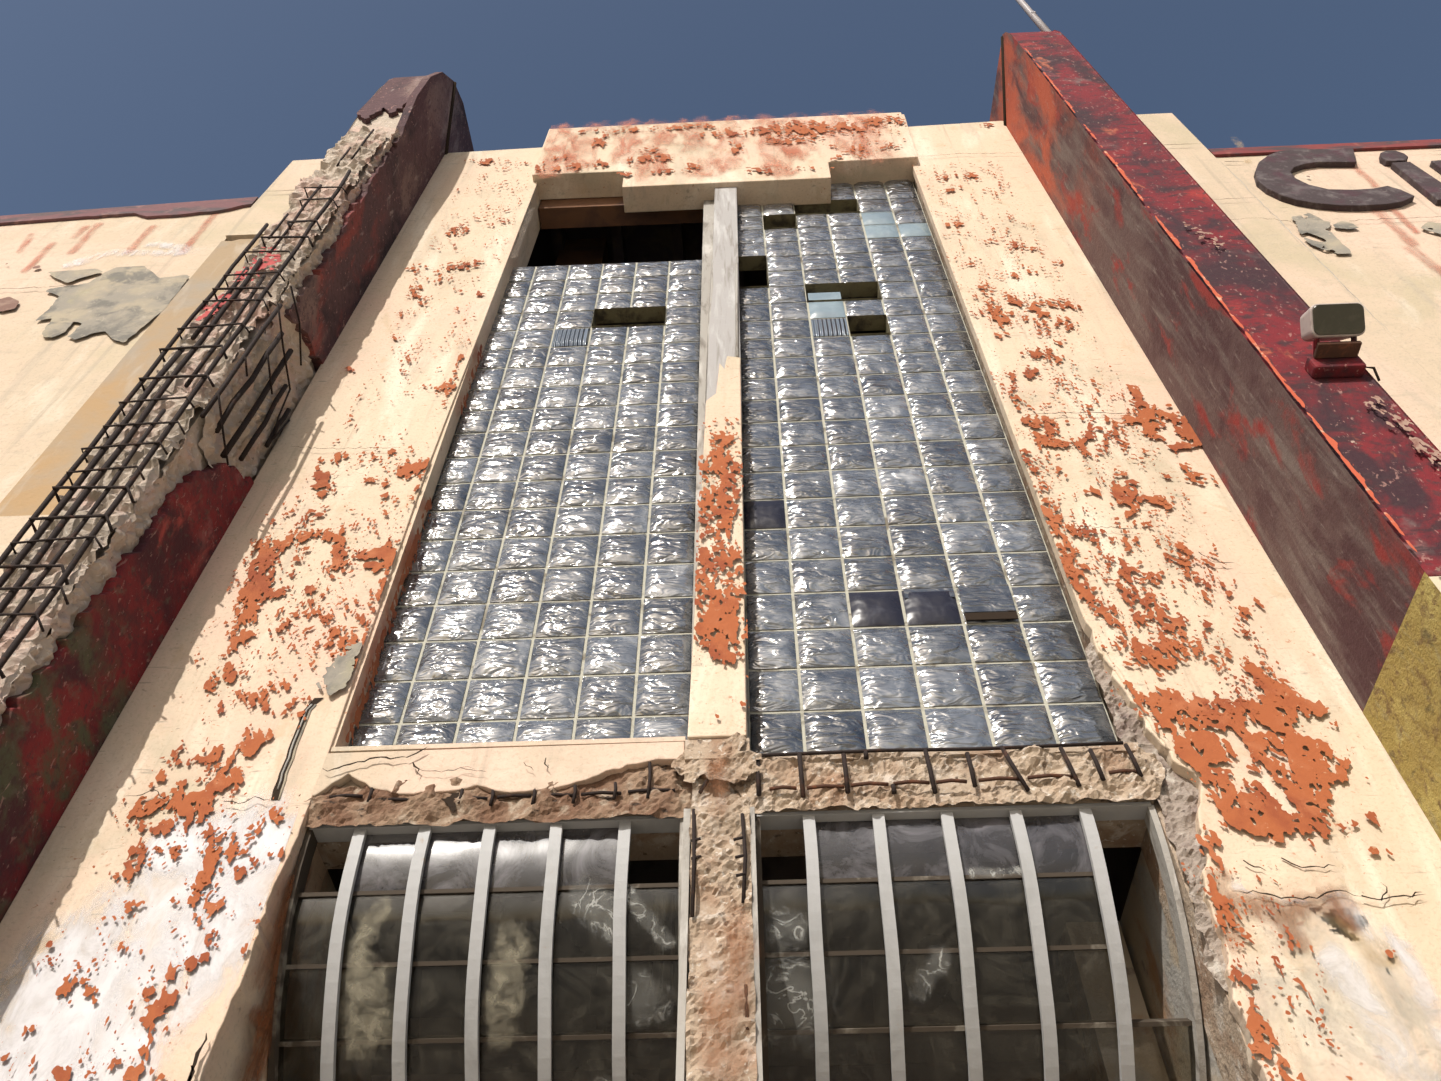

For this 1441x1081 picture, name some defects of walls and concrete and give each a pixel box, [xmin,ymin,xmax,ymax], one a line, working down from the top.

peeling [1024,48,1417,552]
leakage [0,799,294,1081]
crack [224,698,485,804]
peeling [0,114,906,1081]
spalling [296,161,1380,1081]
crack [1240,857,1424,901]